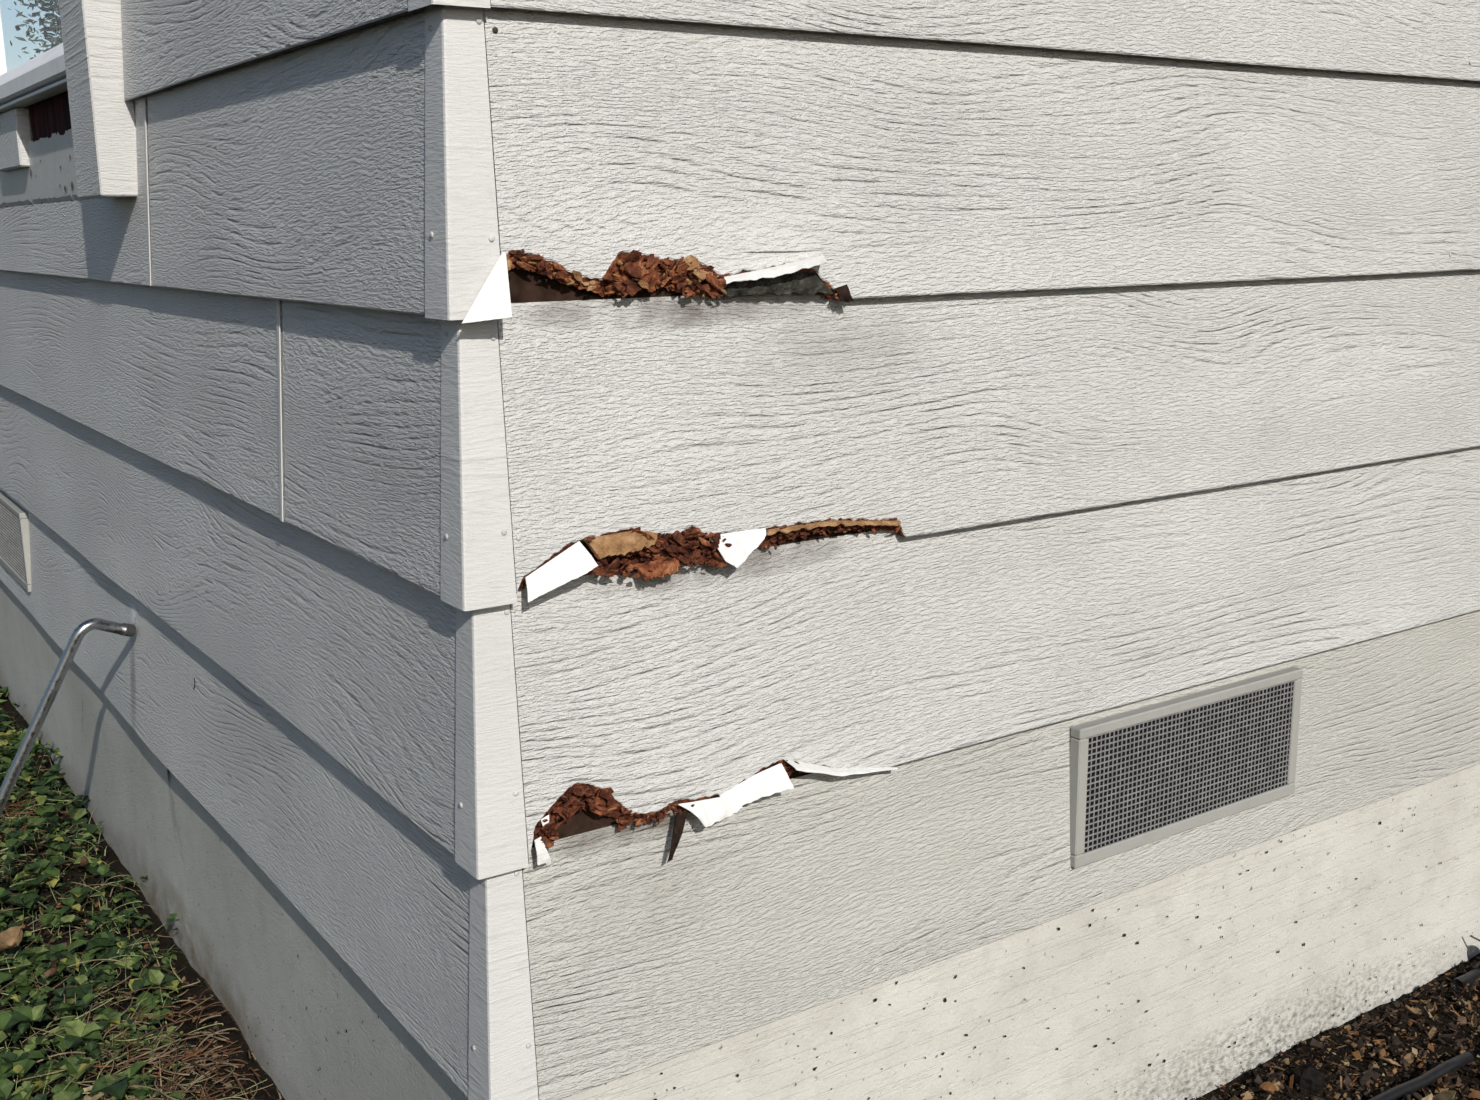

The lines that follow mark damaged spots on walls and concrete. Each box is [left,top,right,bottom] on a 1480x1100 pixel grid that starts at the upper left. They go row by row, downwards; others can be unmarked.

peeling [724,255,827,284]
peeling [525,541,598,602]
peeling [709,528,766,568]
peeling [677,759,898,827]
peeling [534,815,551,865]